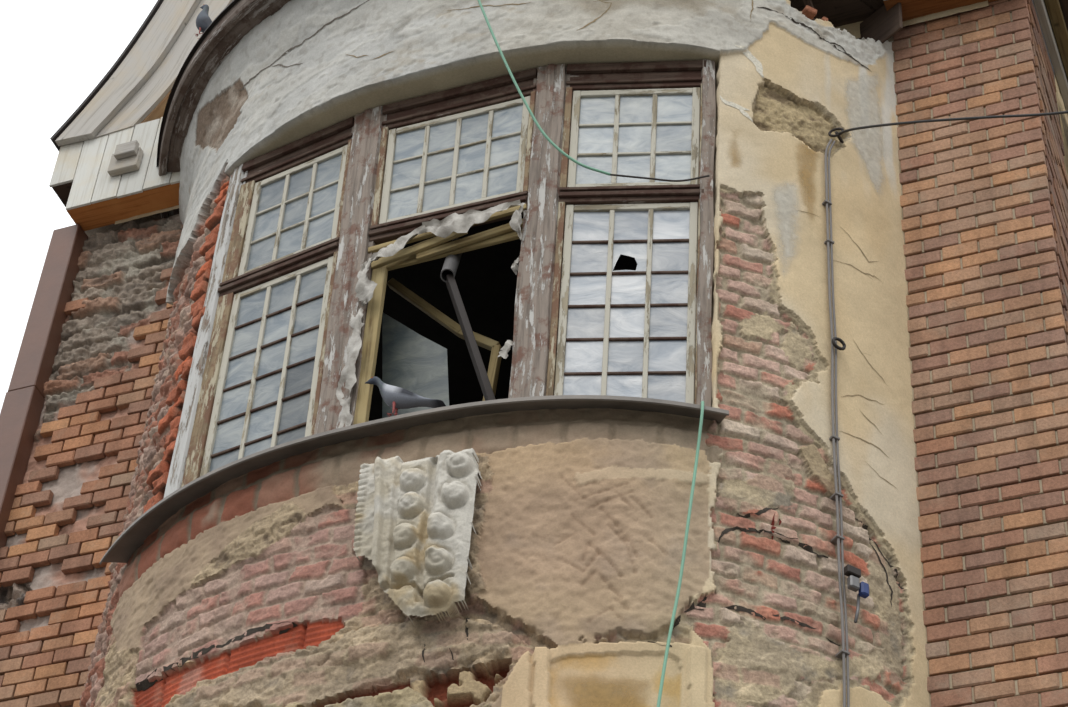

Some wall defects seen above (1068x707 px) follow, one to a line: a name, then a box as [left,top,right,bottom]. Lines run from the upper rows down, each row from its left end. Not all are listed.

crack [238,0,369,91]
crack [447,2,530,11]
crack [578,0,612,30]
spalling [802,0,828,21]
peeling [195,77,249,150]
spalling [752,78,852,158]
crack [834,228,877,278]
spalling [34,159,232,536]
spalling [685,184,916,707]
crack [840,341,896,488]
flaking render [79,454,535,707]
crack [854,513,905,606]